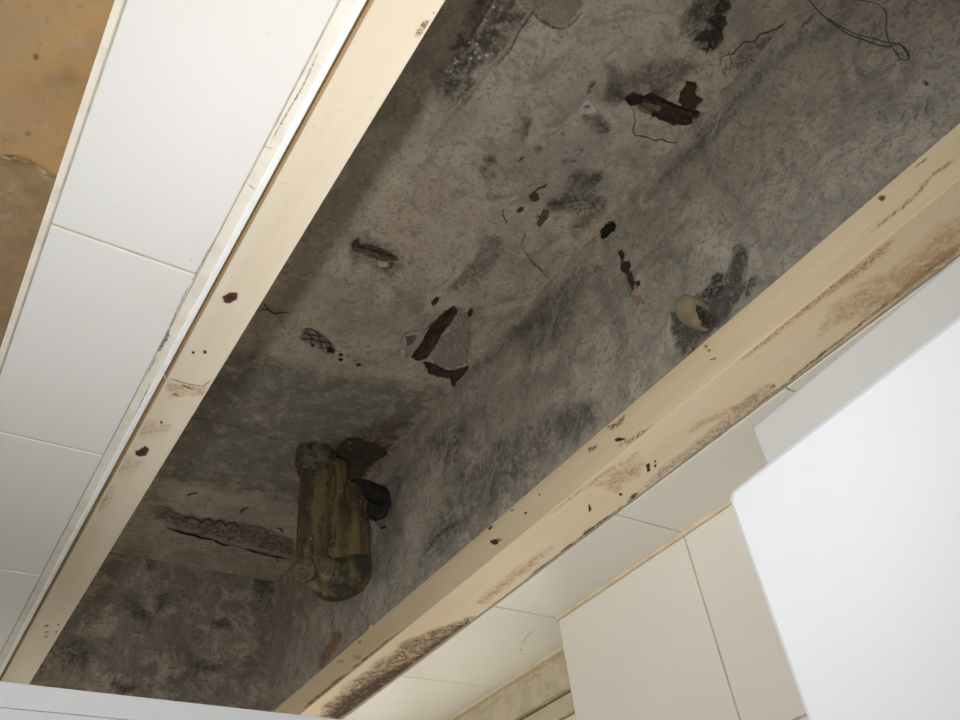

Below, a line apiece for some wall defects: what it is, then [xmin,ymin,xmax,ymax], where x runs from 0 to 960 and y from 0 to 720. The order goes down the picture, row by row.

damp [443,0,524,99]
damp [683,0,731,53]
crack [720,22,785,72]
spalling [625,81,715,125]
spalling [351,238,398,273]
corrosion [223,293,237,303]
damp [671,244,756,360]
spalling [302,328,343,361]
spalling [400,306,470,387]
crack [168,528,287,562]
damp [505,493,638,584]
damp [308,621,468,719]